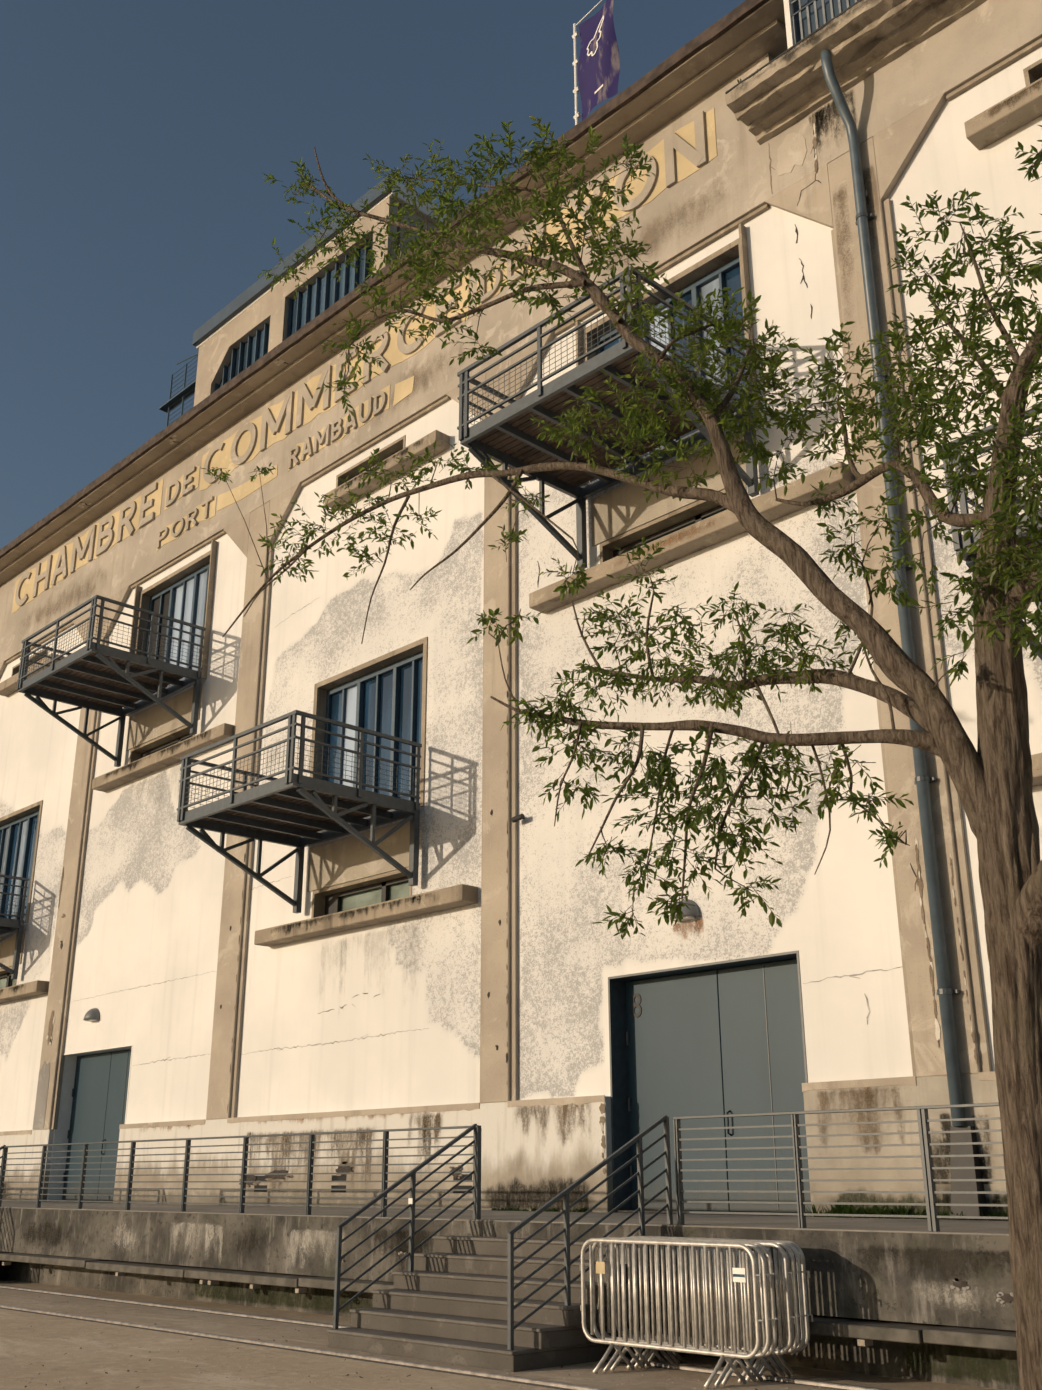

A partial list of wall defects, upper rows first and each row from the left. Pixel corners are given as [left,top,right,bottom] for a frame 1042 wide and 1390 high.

crack [768,119,821,319]
crack [803,967,901,1025]
damp [418,1115,440,1155]
damp [519,1104,582,1140]
damp [819,1088,900,1151]
mould [488,1179,588,1208]